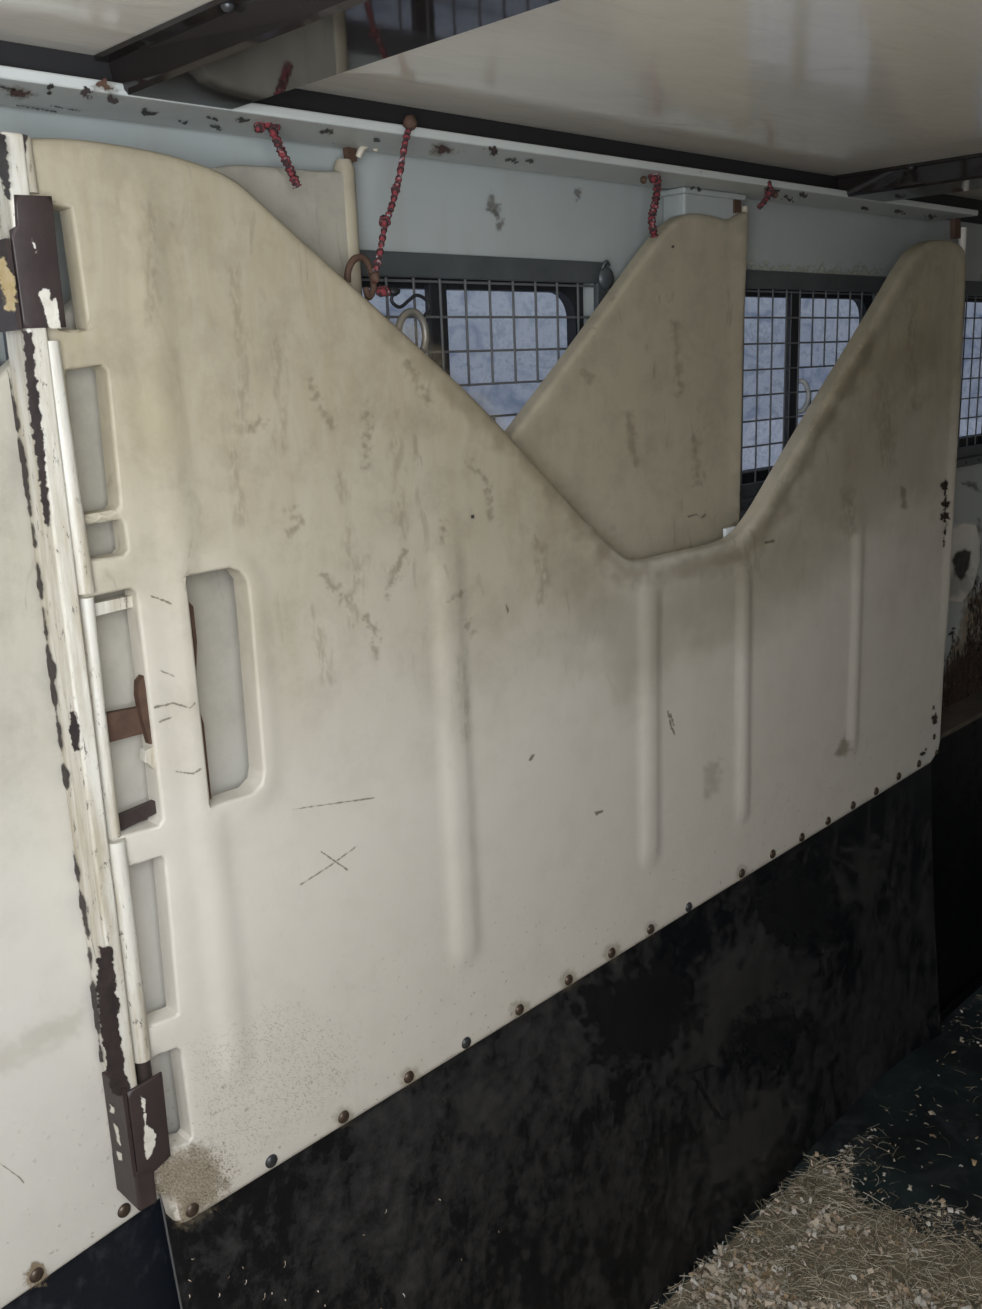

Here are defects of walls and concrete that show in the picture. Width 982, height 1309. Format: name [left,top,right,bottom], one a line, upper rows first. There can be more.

corrosion [0,78,119,112]
peeling [0,134,10,200]
corrosion [489,146,534,164]
peeling [38,288,61,329]
peeling [8,330,50,548]
corrosion [940,480,950,547]
peeling [36,564,80,790]
peeling [74,855,156,1161]